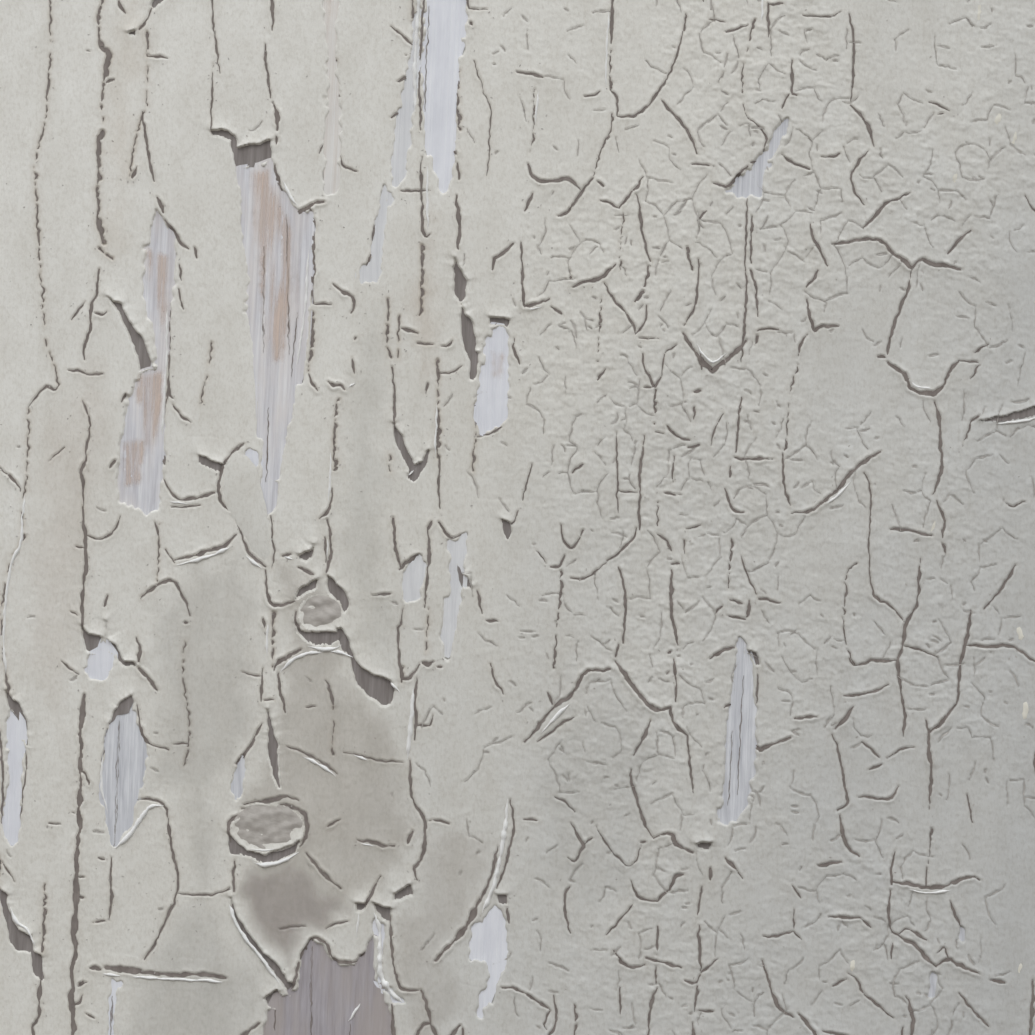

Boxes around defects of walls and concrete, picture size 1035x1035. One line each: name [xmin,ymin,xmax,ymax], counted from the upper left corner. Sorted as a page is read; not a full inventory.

peeling [419,0,468,193]
peeling [725,119,789,198]
peeling [109,158,316,515]
peeling [473,318,509,436]
peeling [402,554,427,603]
peeling [440,532,468,658]
peeling [84,639,118,681]
peeling [0,693,28,846]
peeling [99,696,148,847]
peeling [717,637,759,825]
peeling [263,912,404,1035]
peeling [469,905,508,1019]